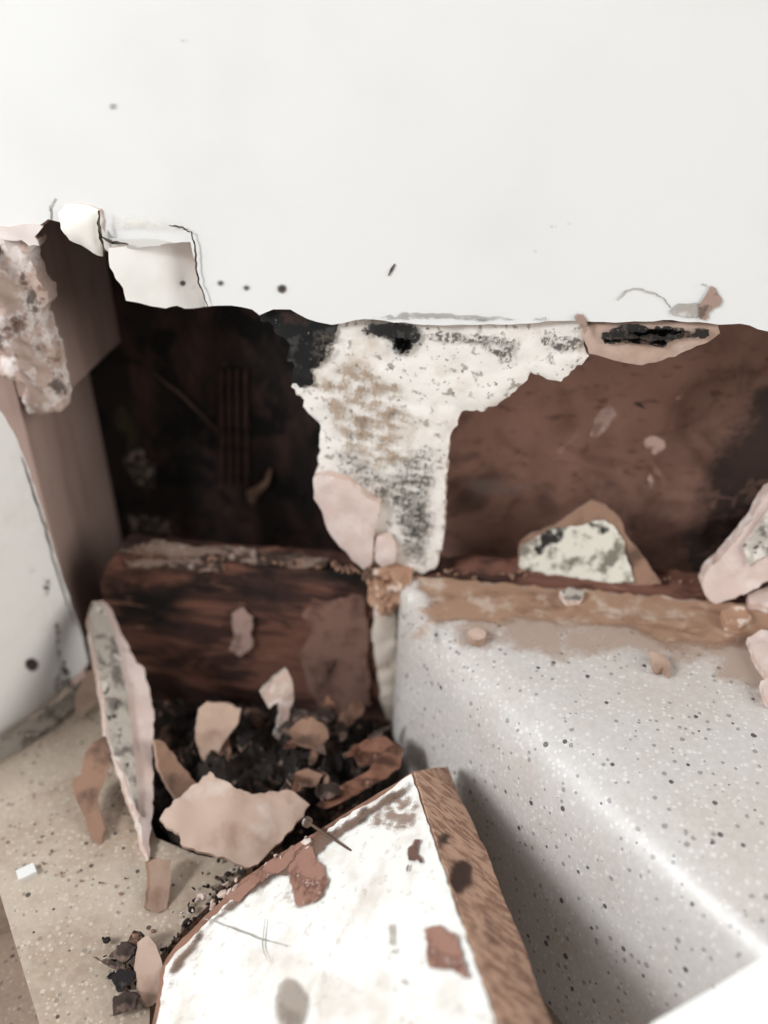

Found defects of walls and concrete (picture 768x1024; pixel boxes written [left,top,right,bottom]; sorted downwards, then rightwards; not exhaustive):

flaking render [0,223,72,415]
mould [361,322,515,363]
mould [543,337,581,351]
flaking render [575,284,722,365]
mould [601,324,709,348]
spalling [58,203,397,570]
mould [322,364,432,564]
flaking render [559,587,584,606]
peeling [68,669,99,716]
peeling [299,594,372,716]
flaking render [467,628,486,647]
flaking render [720,587,768,708]